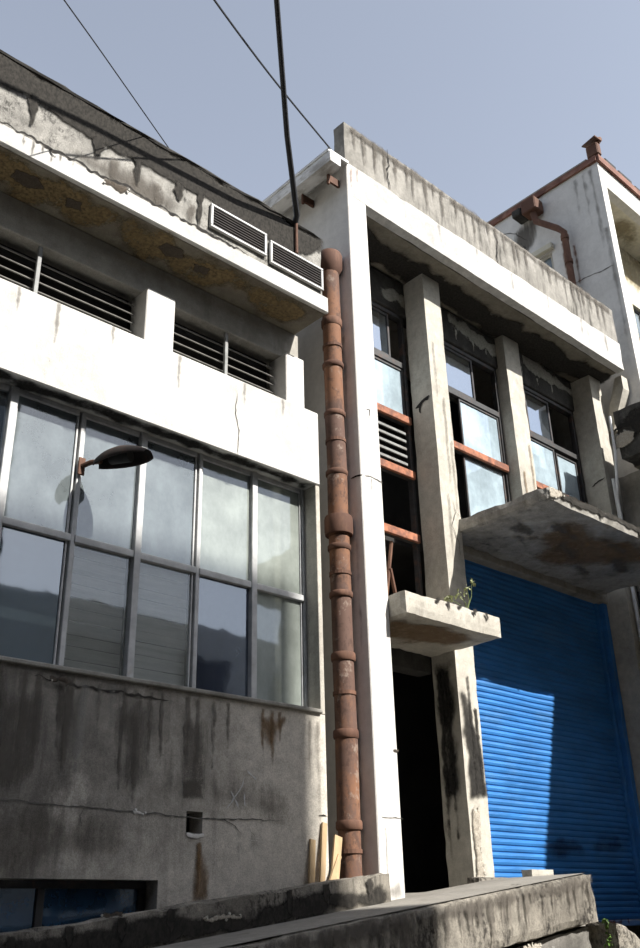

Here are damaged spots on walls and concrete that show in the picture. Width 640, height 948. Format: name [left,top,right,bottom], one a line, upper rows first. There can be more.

spalling [103,178,130,193]
water stain [0,53,323,255]
water stain [350,128,609,324]
water stain [615,221,634,241]
water stain [367,226,611,384]
spalling [615,430,634,450]
water stain [558,490,640,535]
water stain [116,688,163,786]
water stain [184,697,230,789]
rust [261,710,285,754]
water stain [436,672,459,839]
water stain [467,676,484,795]